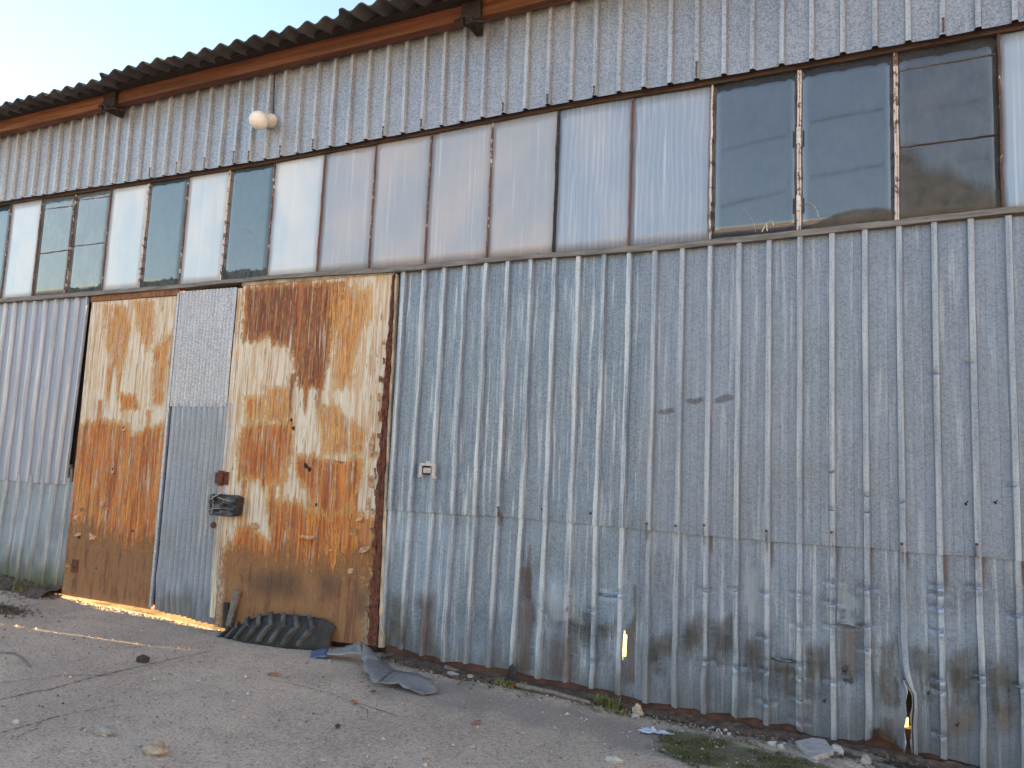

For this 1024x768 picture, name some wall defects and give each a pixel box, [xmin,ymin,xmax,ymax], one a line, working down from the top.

corrosion [61,289,178,609]
corrosion [214,279,376,645]
crack [903,680,914,754]